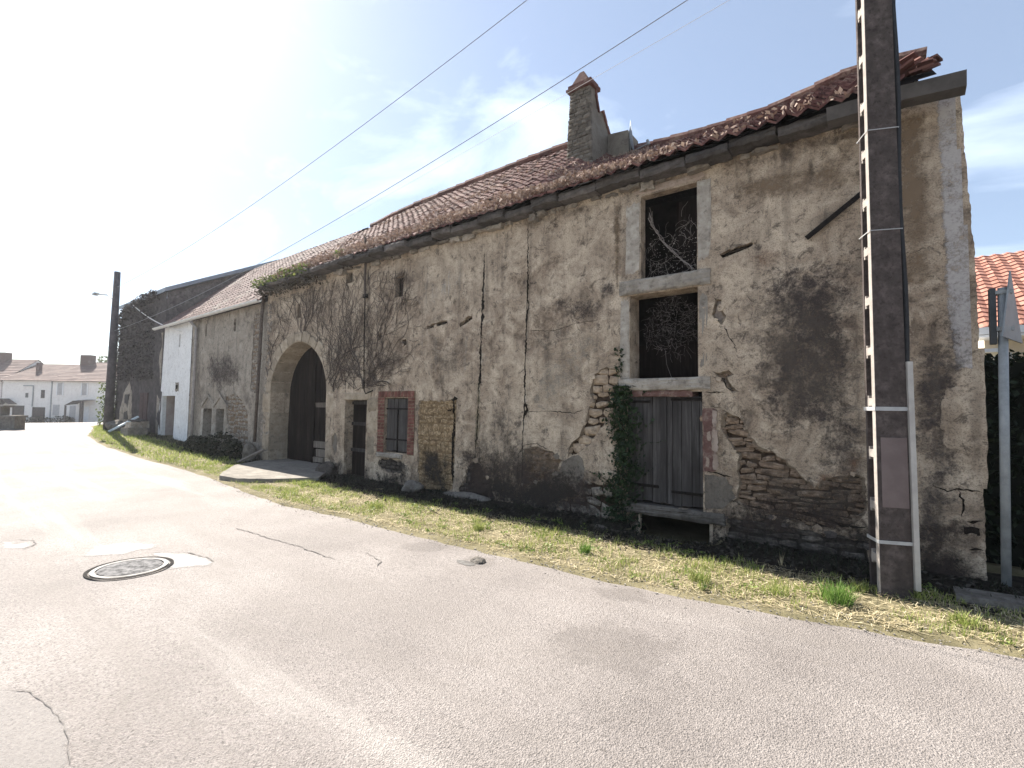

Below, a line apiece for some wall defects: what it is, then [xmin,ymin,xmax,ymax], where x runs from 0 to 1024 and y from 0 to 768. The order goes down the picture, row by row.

crack [447,254,485,484]
crack [518,229,596,486]
flaking render [521,367,619,486]
flaking render [700,410,869,562]
leakage [758,263,861,468]
crack [933,485,984,551]